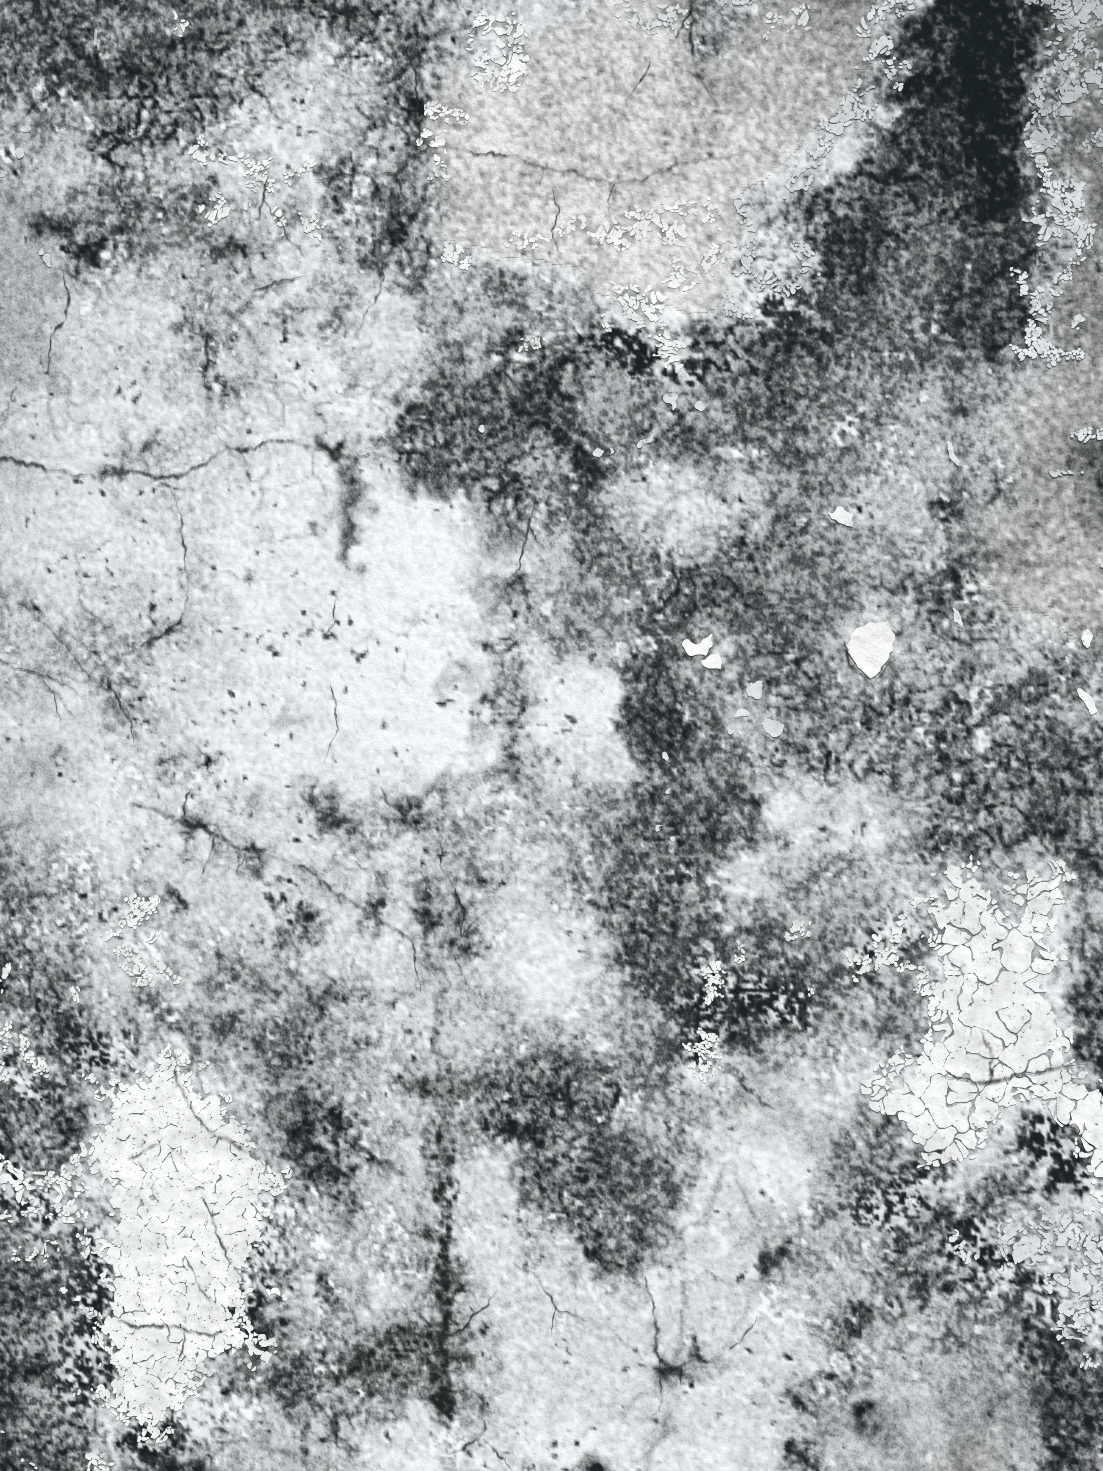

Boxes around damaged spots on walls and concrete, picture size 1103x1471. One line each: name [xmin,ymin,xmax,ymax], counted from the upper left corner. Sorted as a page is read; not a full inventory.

water stain [0,0,441,295]
crack [142,518,187,645]
crack [0,439,385,482]
peeling [985,0,1103,648]
water stain [221,0,1103,1471]
peeling [0,962,22,994]
peeling [0,1021,51,1082]
water stain [0,852,130,1471]
peeling [0,1043,293,1444]
peeling [845,855,1103,1370]
peeling [85,1452,115,1471]
water stain [116,1419,213,1471]